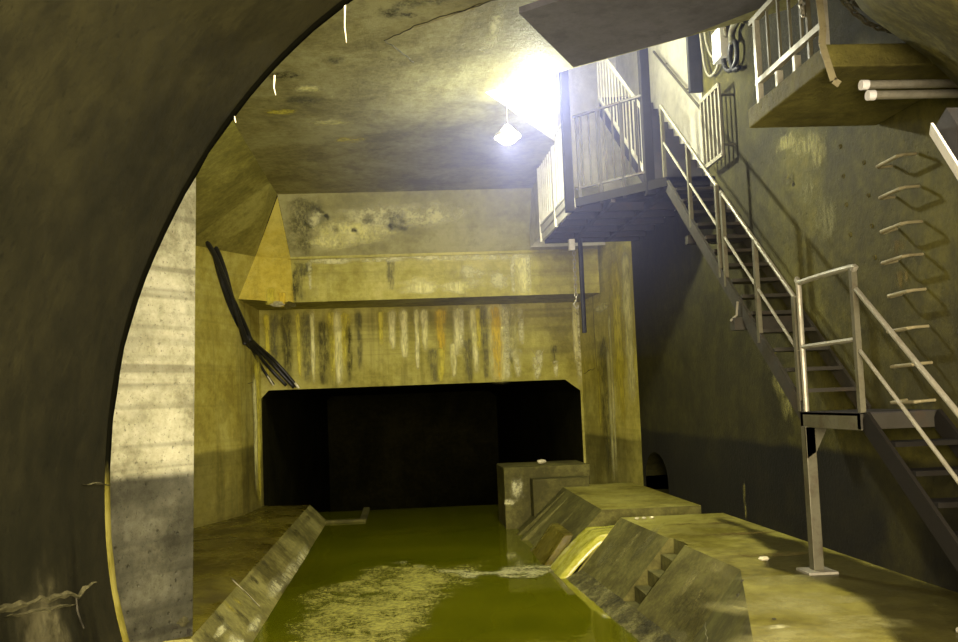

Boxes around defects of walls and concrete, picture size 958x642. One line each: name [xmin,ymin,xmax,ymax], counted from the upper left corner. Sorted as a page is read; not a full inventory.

crack [384,0,495,62]
damp [292,199,453,300]
damp [378,310,438,381]
corrosion [436,309,446,380]
damp [451,305,523,379]
damp [573,306,582,375]
crack [0,582,96,628]